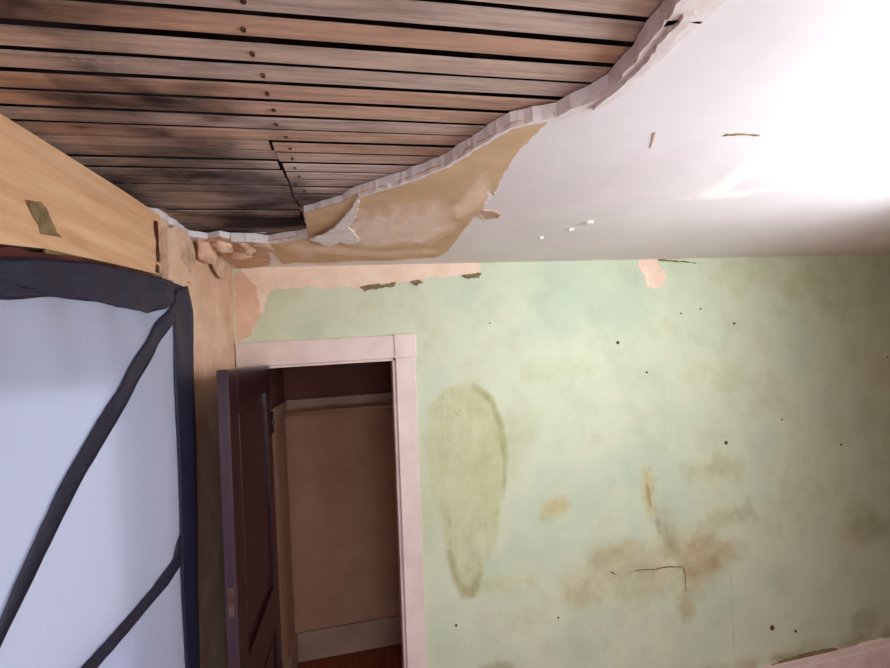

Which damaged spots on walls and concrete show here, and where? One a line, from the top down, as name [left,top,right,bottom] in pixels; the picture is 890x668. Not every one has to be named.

water stain [0,0,45,23]
water stain [109,142,318,233]
peeling [197,0,726,342]